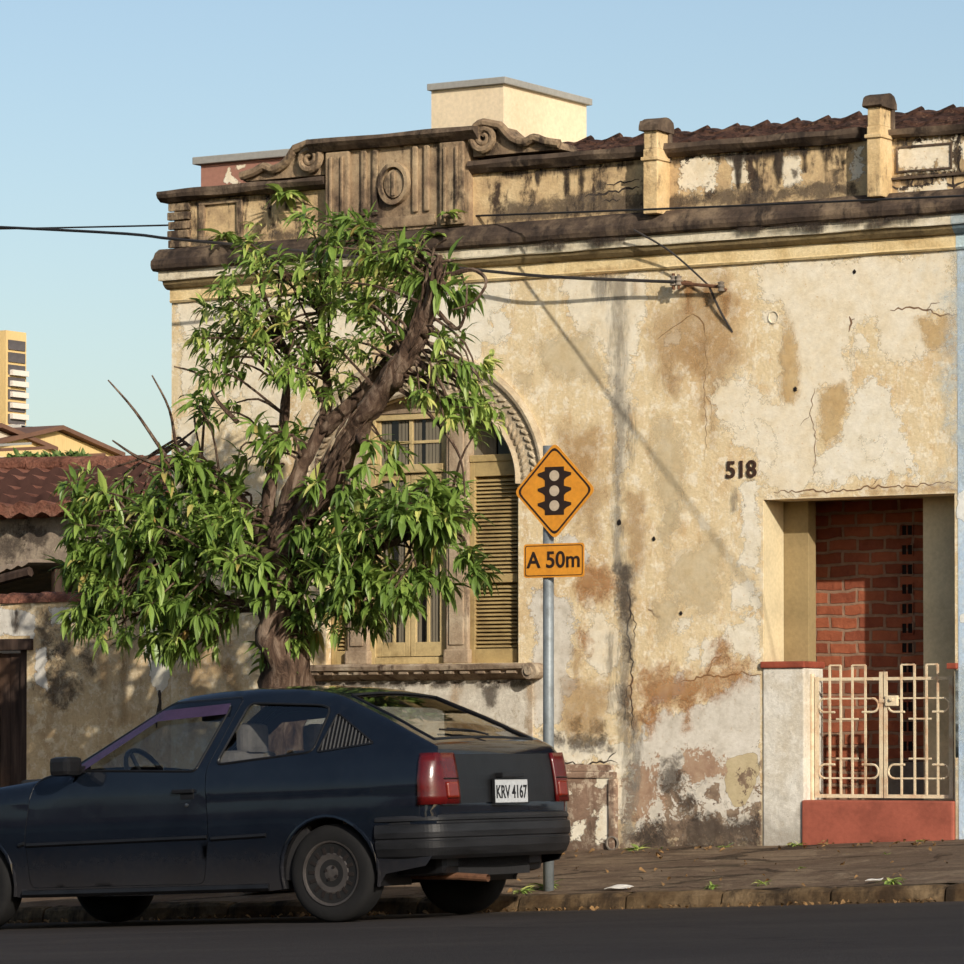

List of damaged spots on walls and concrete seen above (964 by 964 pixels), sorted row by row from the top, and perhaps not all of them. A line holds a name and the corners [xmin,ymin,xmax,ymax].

leakage [669,145,858,210]
peeling [892,134,964,192]
crack [890,302,955,317]
crack [774,390,954,493]
peeling [528,250,957,849]
leakage [614,562,633,623]
peeling [0,607,48,690]